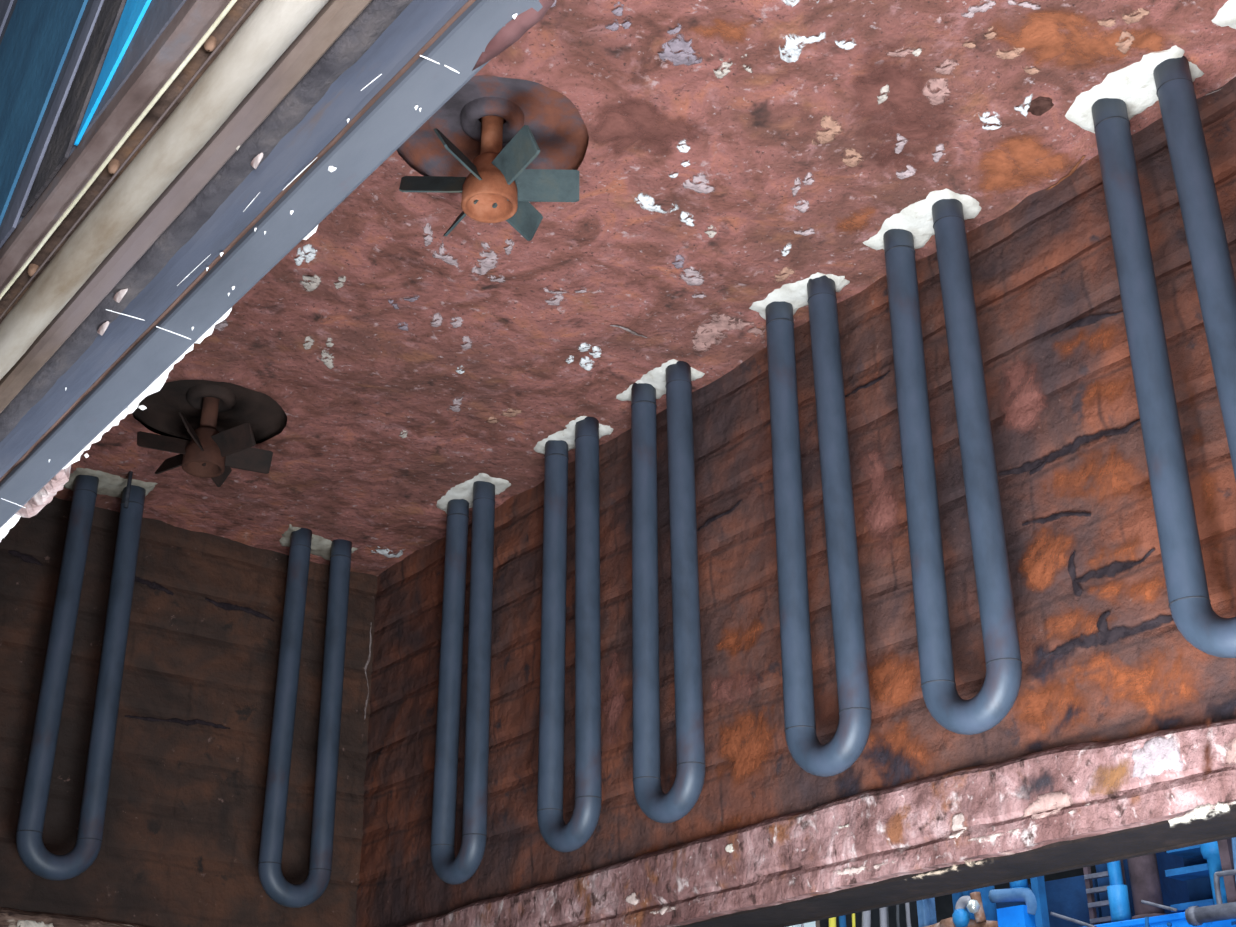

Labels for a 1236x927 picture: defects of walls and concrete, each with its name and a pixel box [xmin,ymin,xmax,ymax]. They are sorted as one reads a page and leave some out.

spalling [658,23,752,79]
spalling [779,32,856,63]
rust [996,11,1164,65]
spalling [669,141,715,194]
rust [979,135,1070,192]
spalling [634,193,717,238]
spalling [775,229,815,282]
crack [998,419,1140,476]
crack [1022,512,1091,526]
rust [1020,529,1072,590]
crack [1068,548,1155,596]
crack [1043,611,1173,658]